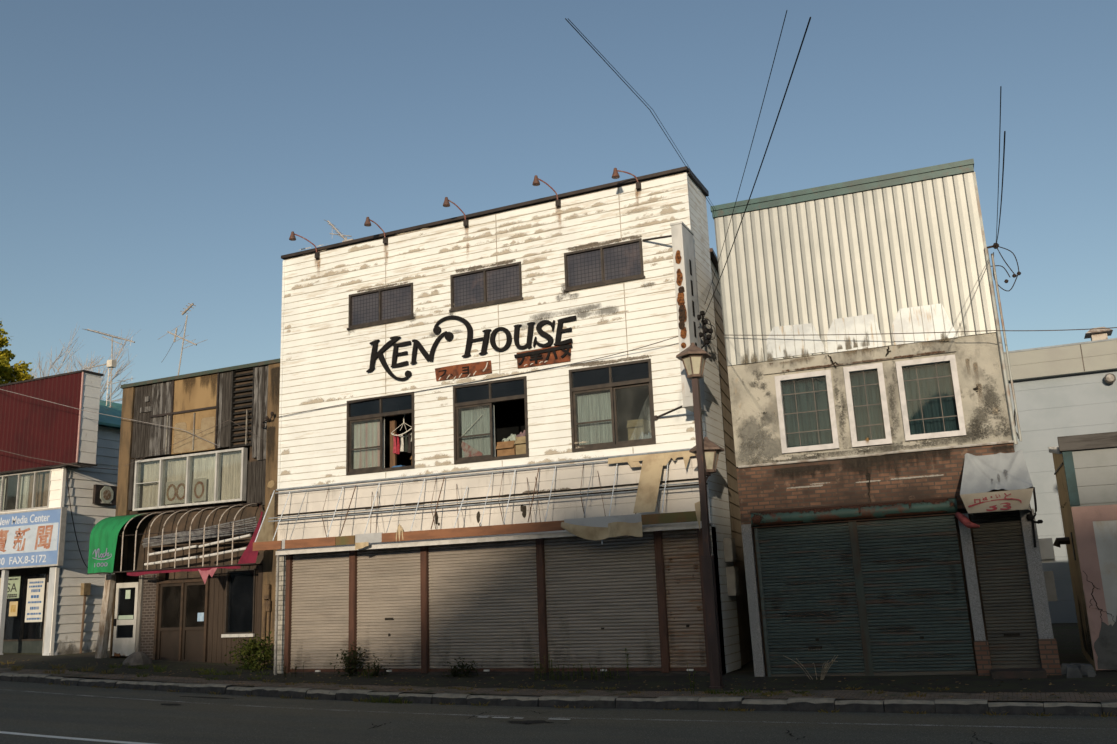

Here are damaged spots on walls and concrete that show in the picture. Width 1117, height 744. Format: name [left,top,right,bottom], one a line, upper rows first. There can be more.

peeling [566,190,684,287]
peeling [284,202,603,338]
peeling [435,368,546,406]
peeling [405,454,468,482]
peeling [528,441,599,464]
leakage [738,413,951,486]
corrosion [751,499,955,526]
crack [1083,571,1114,619]
spalling [1094,616,1117,670]